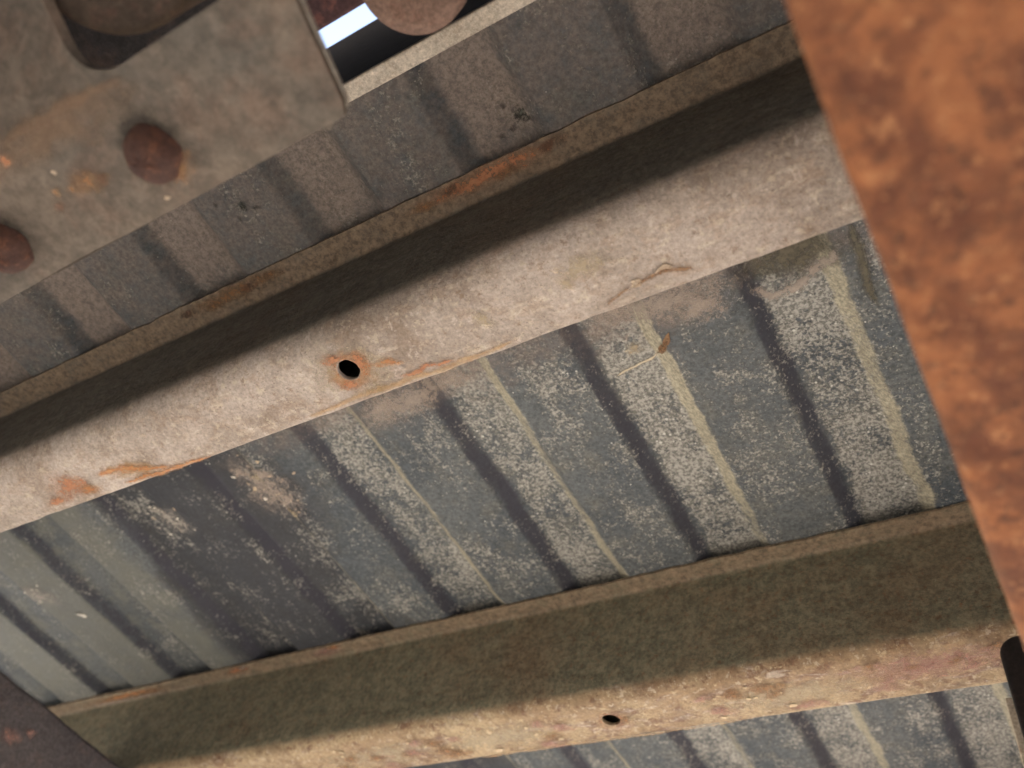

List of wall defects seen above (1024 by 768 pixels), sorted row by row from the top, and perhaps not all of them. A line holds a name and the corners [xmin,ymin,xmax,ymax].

corrosion [416,137,558,213]
corrosion [316,349,399,393]
corrosion [49,476,98,506]
corrosion [99,456,209,483]